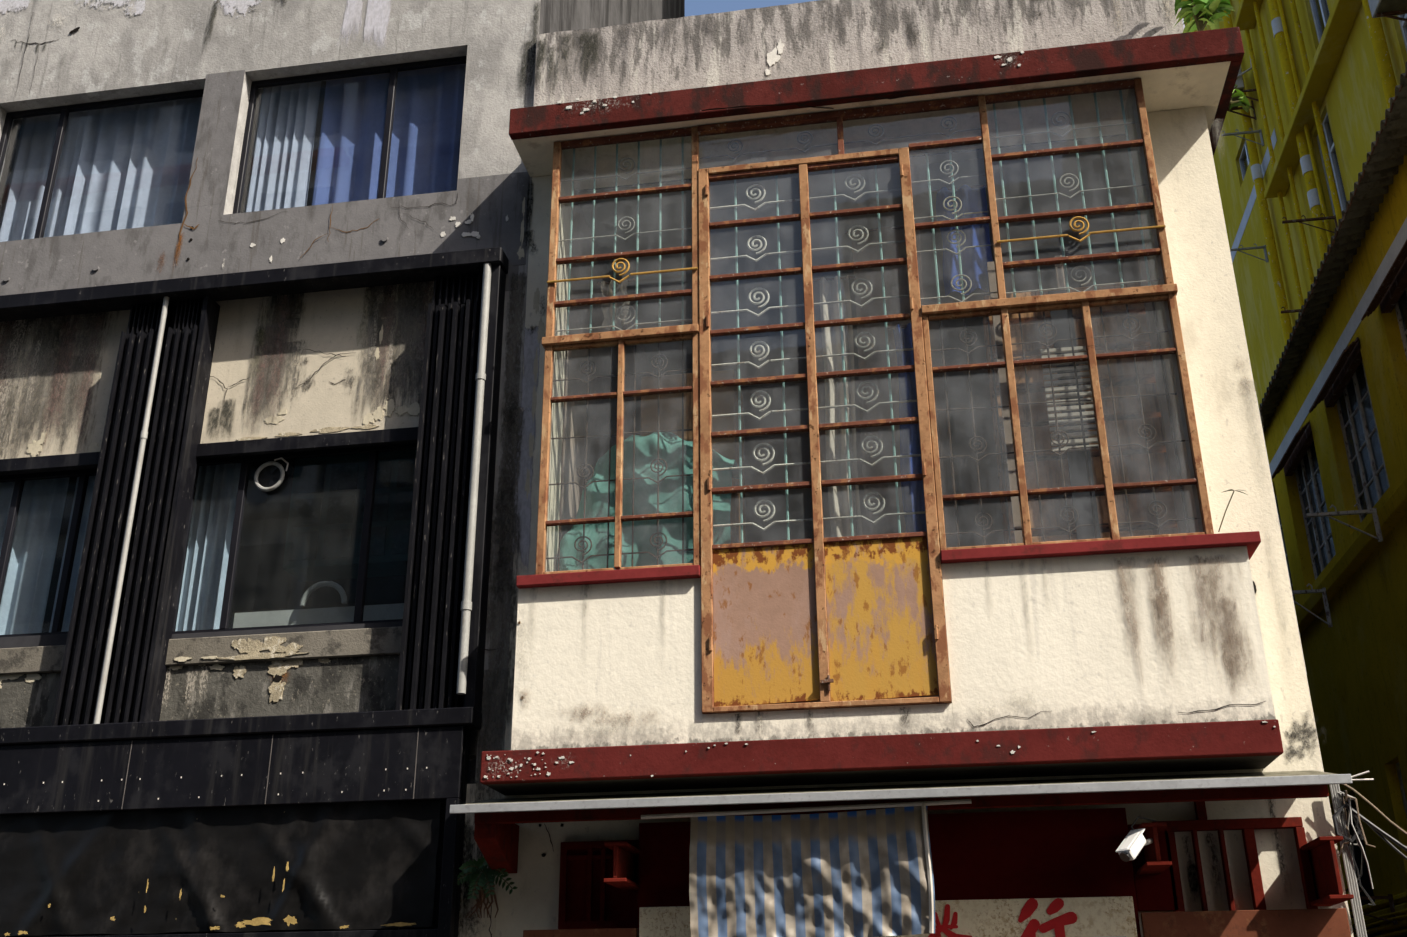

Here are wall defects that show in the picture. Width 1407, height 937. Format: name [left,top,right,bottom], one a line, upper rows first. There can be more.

peeling [215,0,262,19]
peeling [342,0,391,42]
leakage [518,4,599,88]
leakage [0,311,118,458]
leakage [208,293,313,433]
leakage [344,281,434,410]
leakage [470,273,546,802]
leakage [1117,561,1139,649]
leakage [1152,558,1173,647]
leakage [1192,556,1242,677]
spalling [174,636,331,703]
peeling [484,751,574,779]